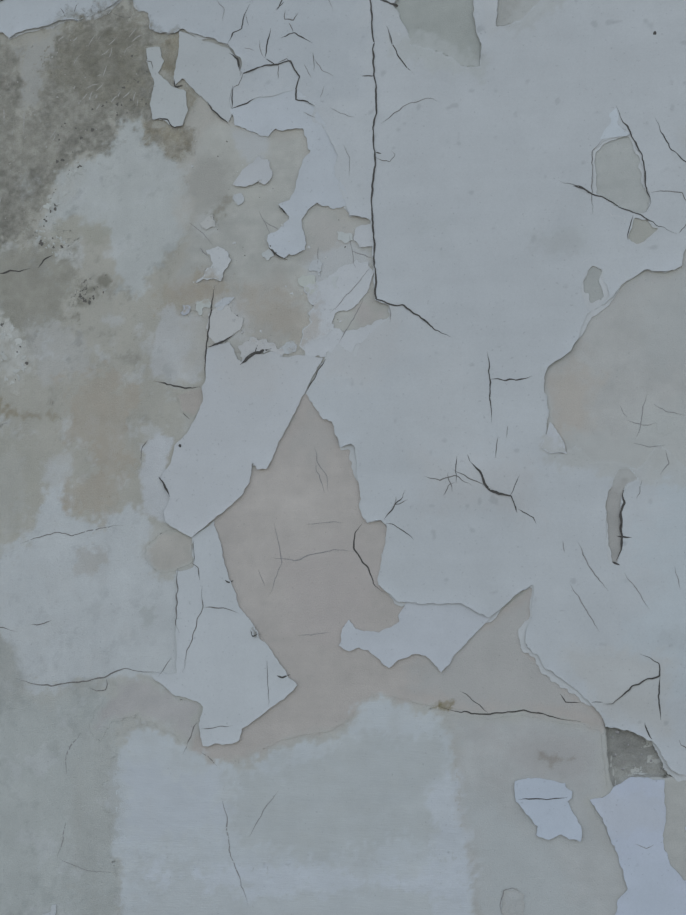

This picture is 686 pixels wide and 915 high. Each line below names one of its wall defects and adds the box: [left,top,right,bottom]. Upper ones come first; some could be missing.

leakage [8,17,70,114]
crack [208,0,351,122]
crack [260,206,287,260]
crack [333,0,450,339]
crack [568,110,686,238]
leakage [0,152,150,567]
peeling [0,0,602,760]
crack [428,353,535,521]
peeling [534,252,686,562]
crack [563,400,682,603]
peeling [514,778,582,842]
spalling [605,727,686,881]